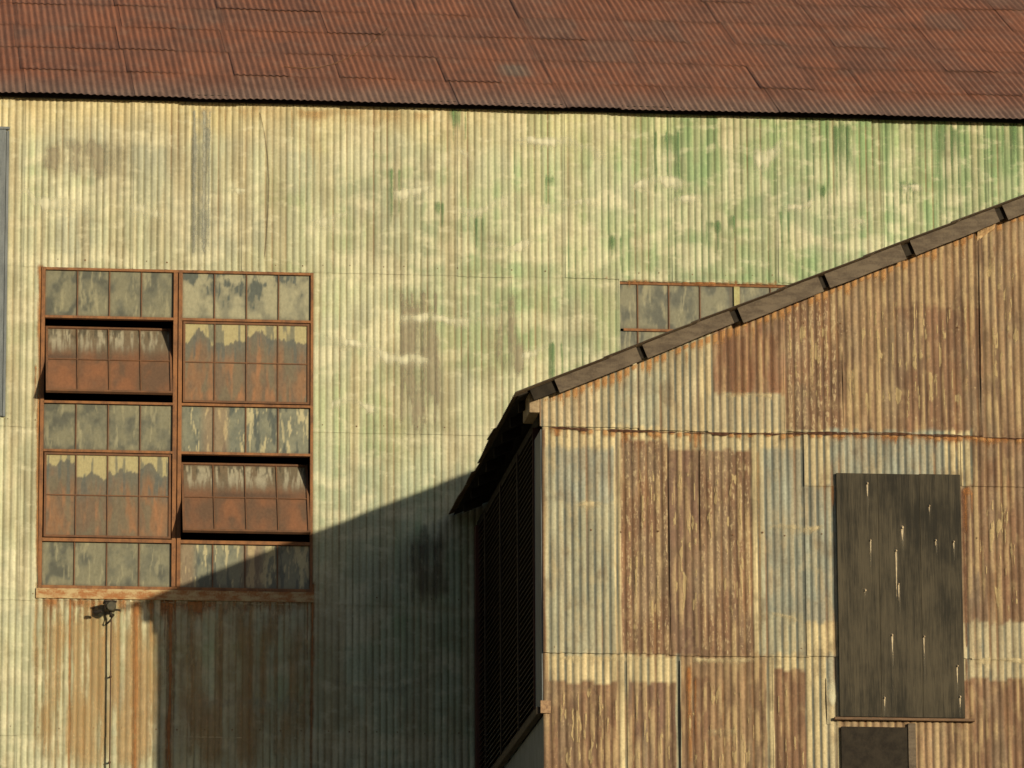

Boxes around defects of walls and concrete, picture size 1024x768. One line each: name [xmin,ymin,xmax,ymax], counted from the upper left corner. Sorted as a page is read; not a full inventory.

water stain [192,111,211,251]
water stain [394,186,428,199]
water stain [527,136,555,146]
water stain [660,176,695,202]
water stain [755,148,780,168]
water stain [379,293,468,429]
water stain [497,300,537,372]
corrosion [551,427,1024,447]
corrosion [44,598,104,752]
corrosion [119,599,224,768]